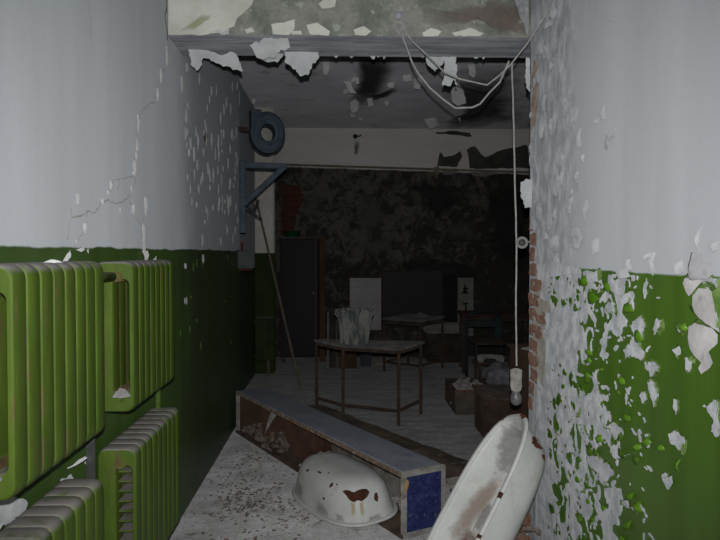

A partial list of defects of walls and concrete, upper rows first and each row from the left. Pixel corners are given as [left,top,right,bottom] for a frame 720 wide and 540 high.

peeling [168,0,253,36]
peeling [250,19,330,76]
peeling [452,28,484,36]
peeling [181,49,243,92]
peeling [525,39,585,162]
crack [67,0,170,251]
peeling [437,143,534,177]
peeling [671,261,720,375]
peeling [520,179,665,540]
peeling [702,398,720,439]
peeling [668,429,687,456]
peeling [661,472,673,490]